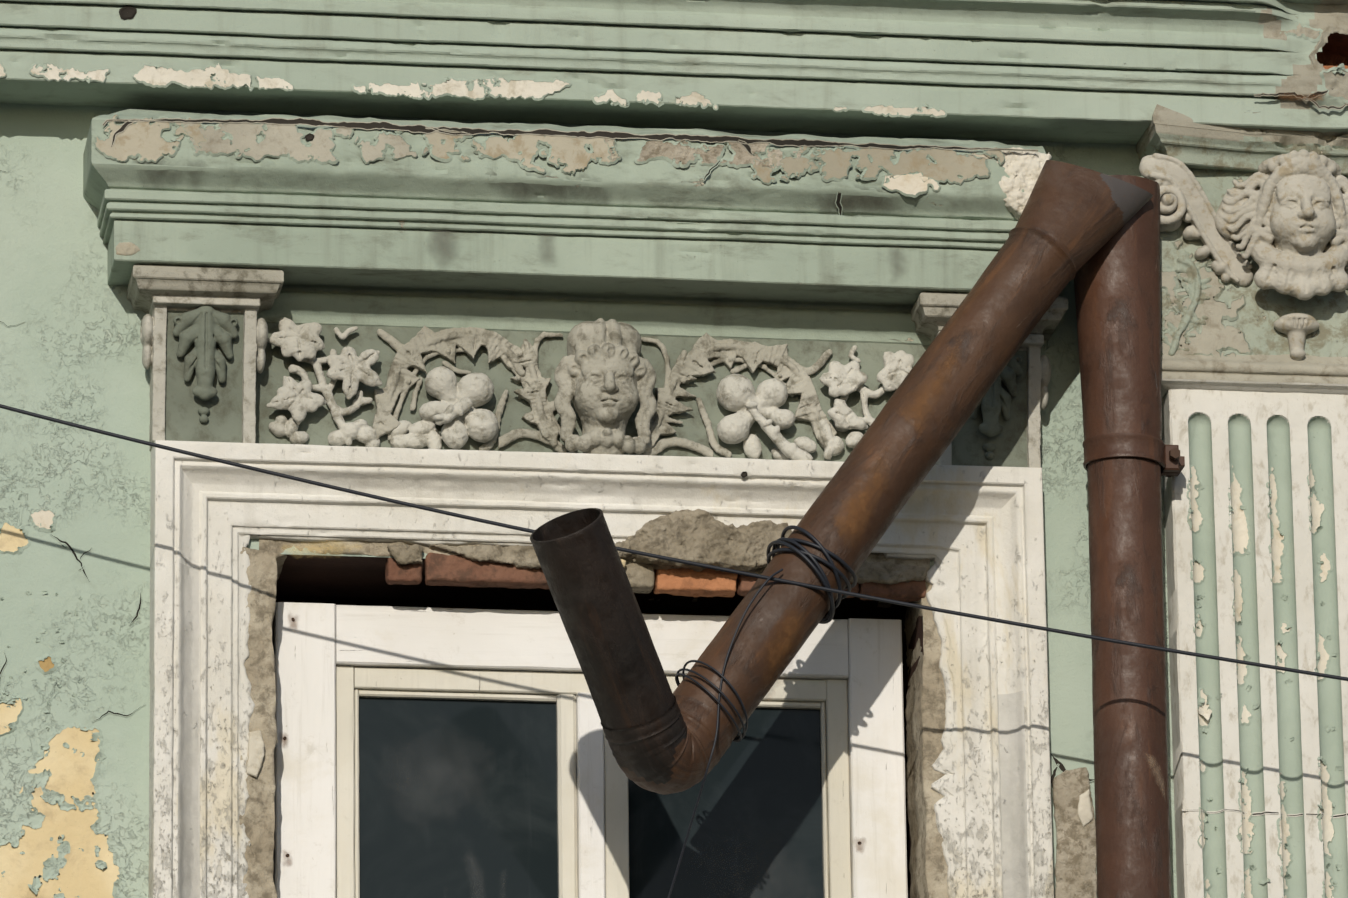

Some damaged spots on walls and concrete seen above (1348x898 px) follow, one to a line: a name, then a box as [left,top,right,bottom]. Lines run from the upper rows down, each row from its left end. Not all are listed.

peeling [29,62,110,84]
peeling [132,62,294,92]
peeling [351,75,571,101]
crack [1254,84,1348,110]
spalling [1279,15,1348,104]
peeling [94,113,1052,220]
spalling [615,509,792,602]
peeling [1228,464,1260,726]
peeling [0,596,123,898]
flaking render [239,539,550,898]
flaking render [842,553,949,898]
spalling [1053,767,1097,898]